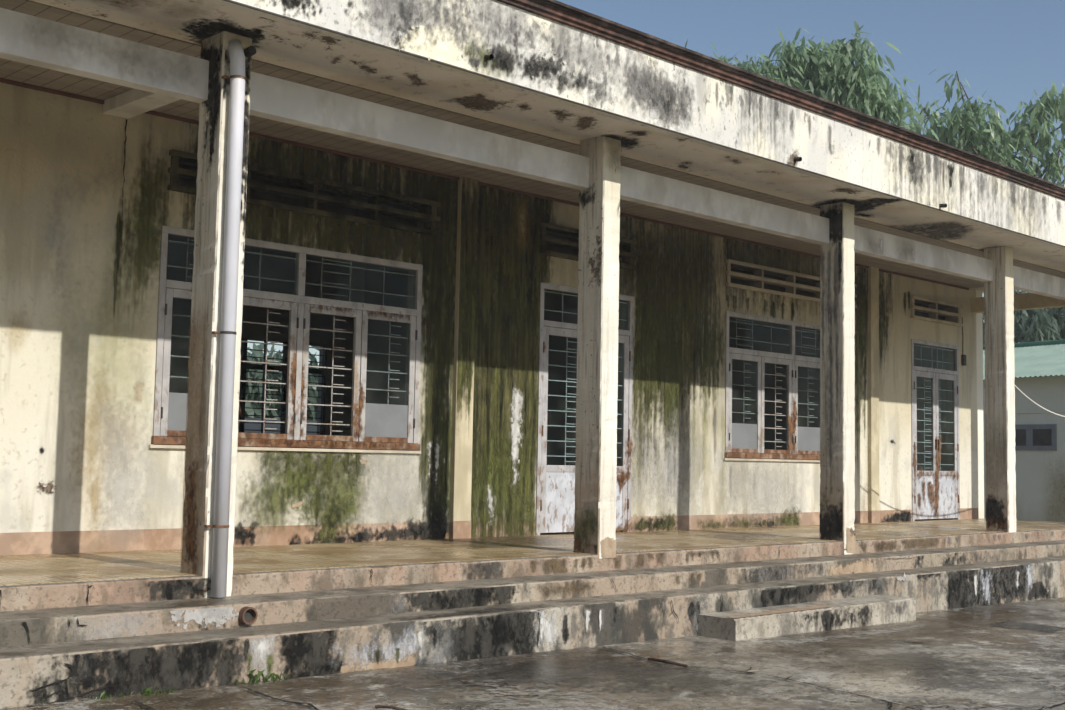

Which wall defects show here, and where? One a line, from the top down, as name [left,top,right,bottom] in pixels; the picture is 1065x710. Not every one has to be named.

water stain [365,0,465,49]
mould [497,13,691,127]
water stain [182,0,322,260]
mould [602,132,647,149]
corrosion [245,354,398,449]
corrosion [616,439,632,494]
corrosion [913,437,956,516]
water stain [638,553,663,566]
water stain [27,557,771,706]
water stain [723,537,1053,677]
crack [244,687,319,710]
crack [602,647,1046,710]